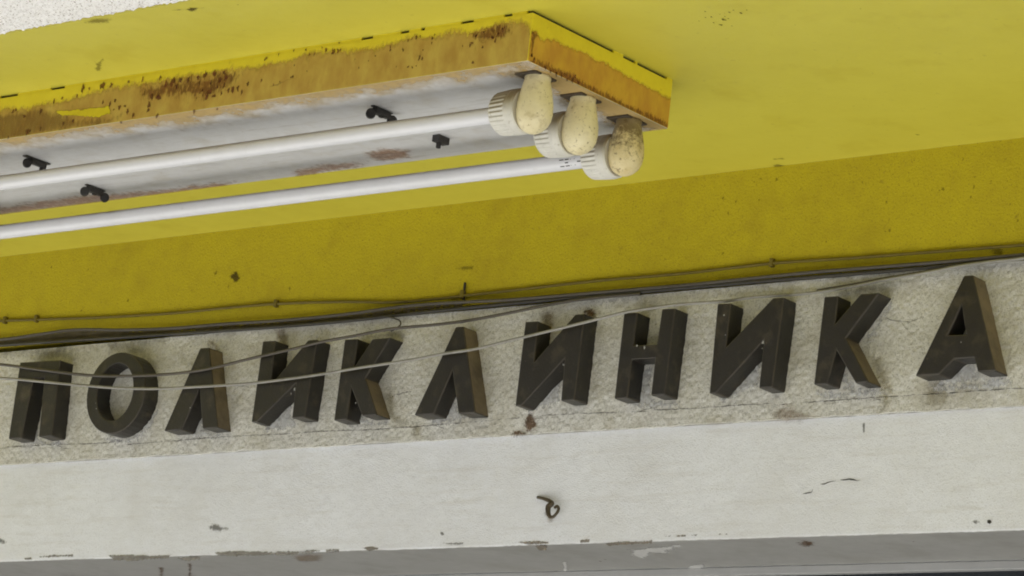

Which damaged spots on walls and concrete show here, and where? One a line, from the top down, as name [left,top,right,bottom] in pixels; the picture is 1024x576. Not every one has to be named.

corrosion [513,414,536,436]
peeling [520,541,548,550]
peeling [216,549,339,557]